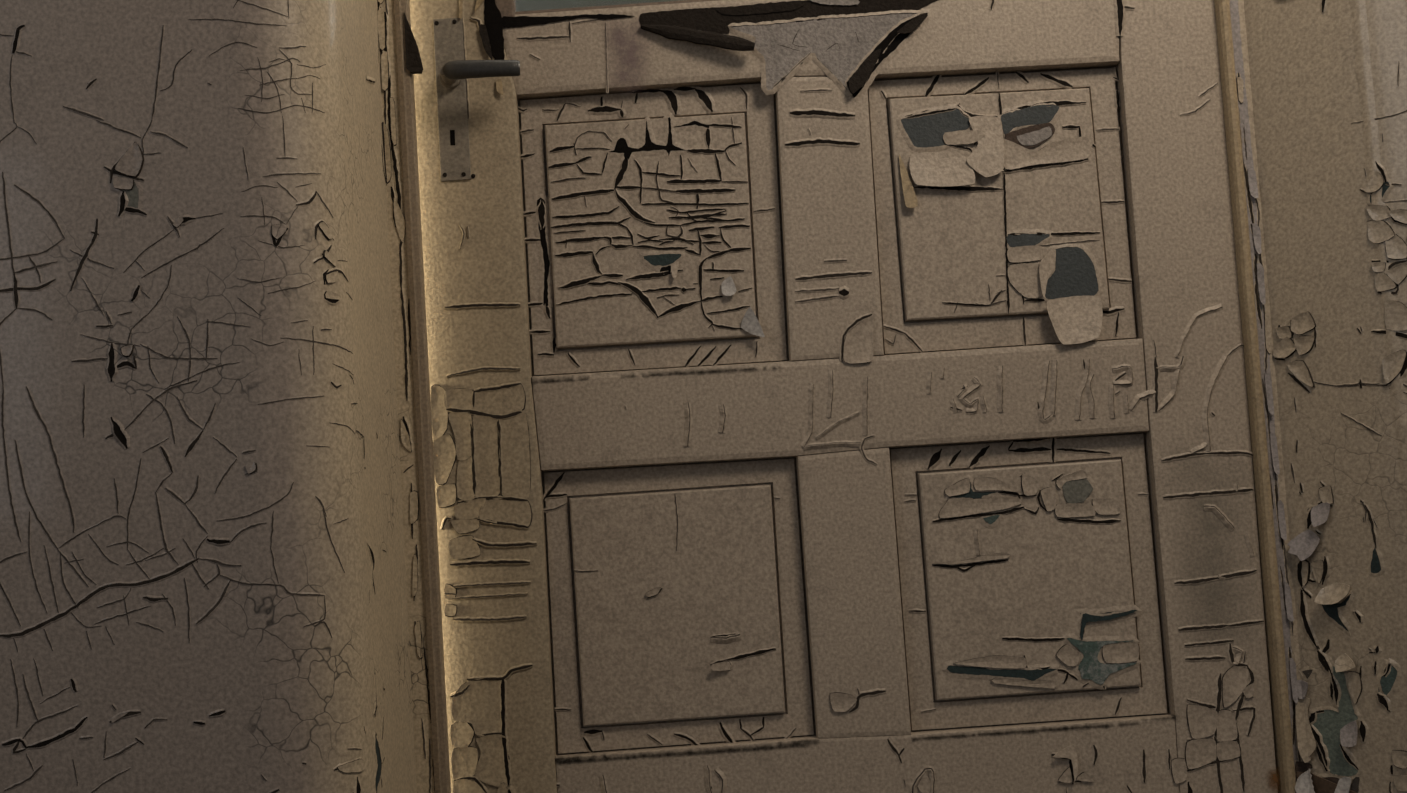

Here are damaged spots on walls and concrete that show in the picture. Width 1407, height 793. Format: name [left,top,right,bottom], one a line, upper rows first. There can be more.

peeling [728,9,932,103]
crack [0,0,366,793]
peeling [431,381,532,534]
peeling [896,93,1103,345]
peeling [933,470,1121,529]
peeling [1273,311,1318,392]
peeling [1335,161,1407,395]
peeling [942,605,1142,690]
peeling [1287,440,1402,793]
peeling [450,663,533,793]